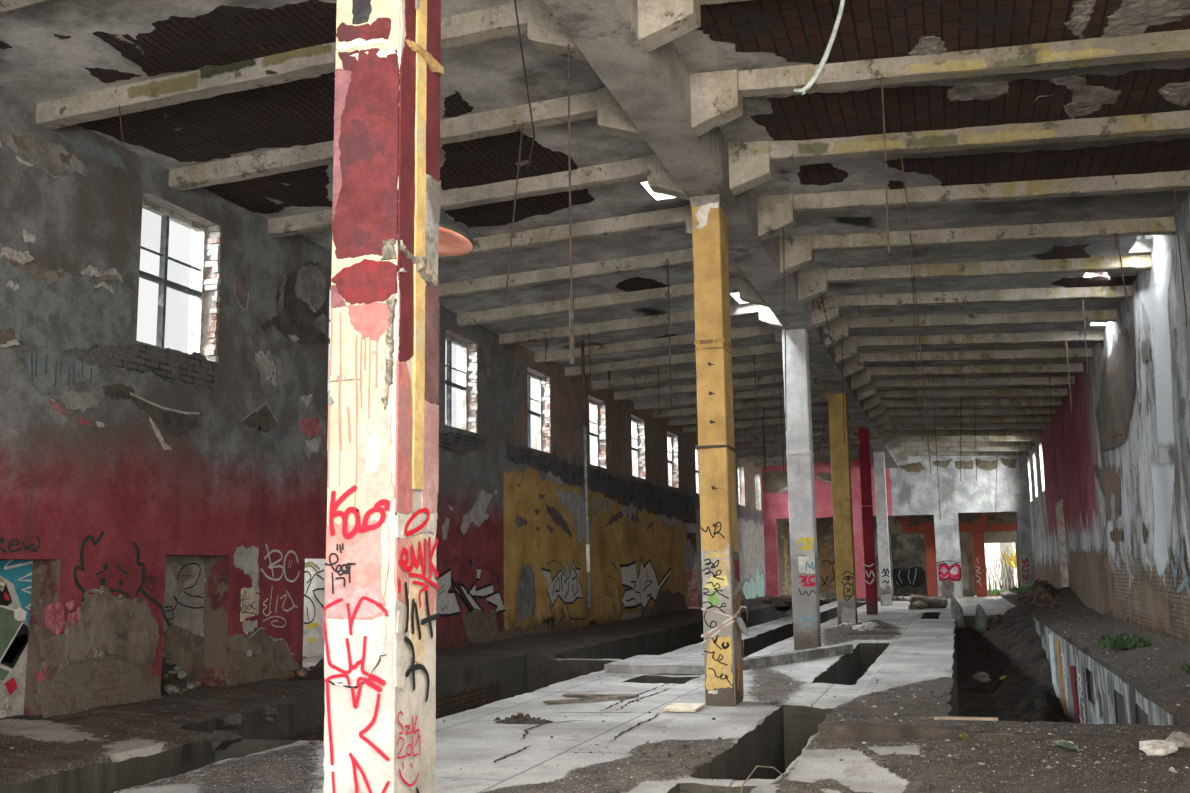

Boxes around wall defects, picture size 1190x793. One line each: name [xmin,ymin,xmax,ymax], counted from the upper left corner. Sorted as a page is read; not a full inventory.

peeling [1064,0,1096,40]
peeling [1102,0,1190,38]
peeling [350,48,397,61]
peeling [85,67,142,83]
peeling [947,81,1009,101]
peeling [1034,75,1121,119]
peeling [797,163,849,186]
flaking render [0,230,215,394]
spalling [381,296,397,410]
flaking render [1094,321,1151,451]